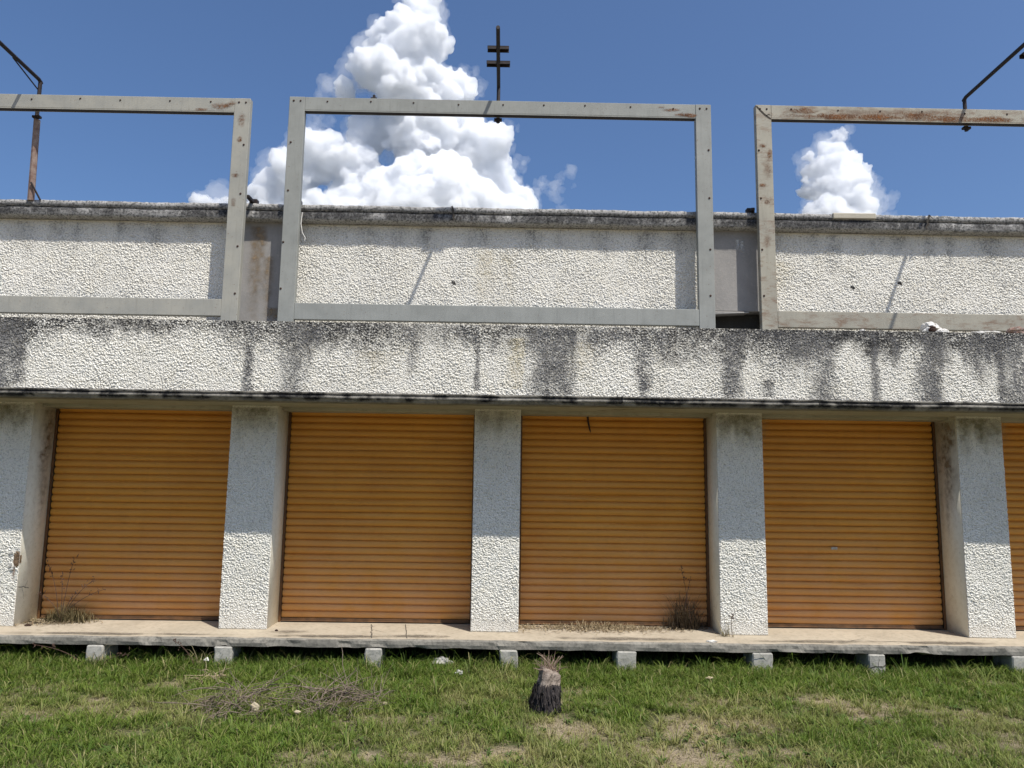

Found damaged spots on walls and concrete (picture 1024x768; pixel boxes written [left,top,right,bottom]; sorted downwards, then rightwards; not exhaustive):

corrosion [790,108,1009,122]
damp [252,210,283,290]
damp [0,294,1024,474]